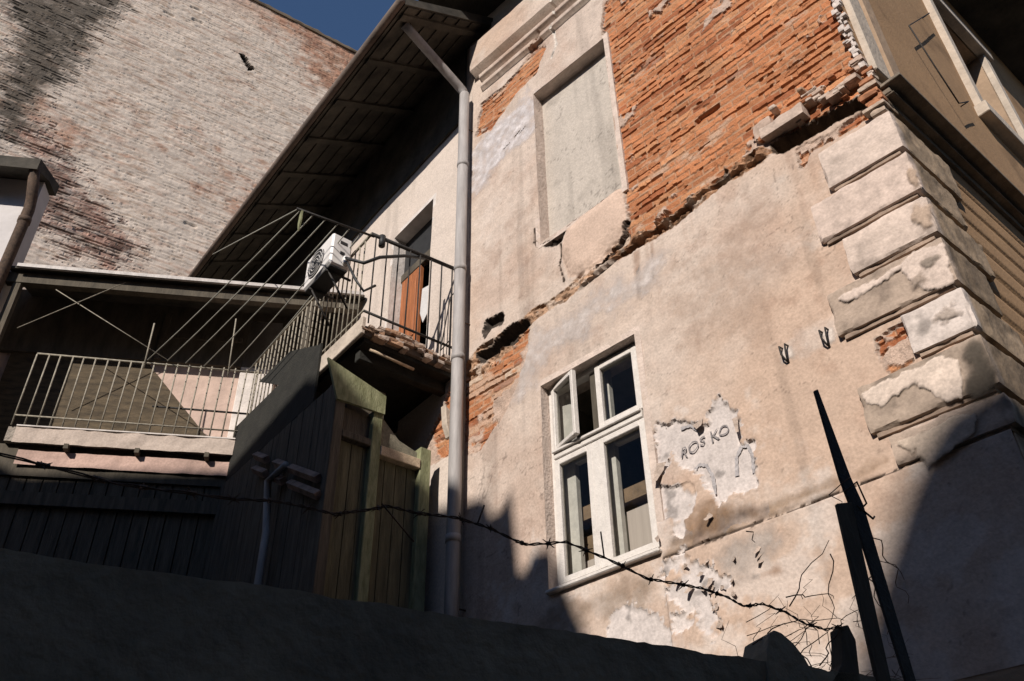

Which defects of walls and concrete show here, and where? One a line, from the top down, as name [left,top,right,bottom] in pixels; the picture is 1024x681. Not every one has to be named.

flaking render [475,28,546,137]
flaking render [600,0,868,244]
crack [533,228,565,282]
flaking render [838,243,954,301]
flaking render [424,386,451,465]
flaking render [464,311,531,456]
flaking render [862,322,963,406]
flaking render [606,394,759,646]